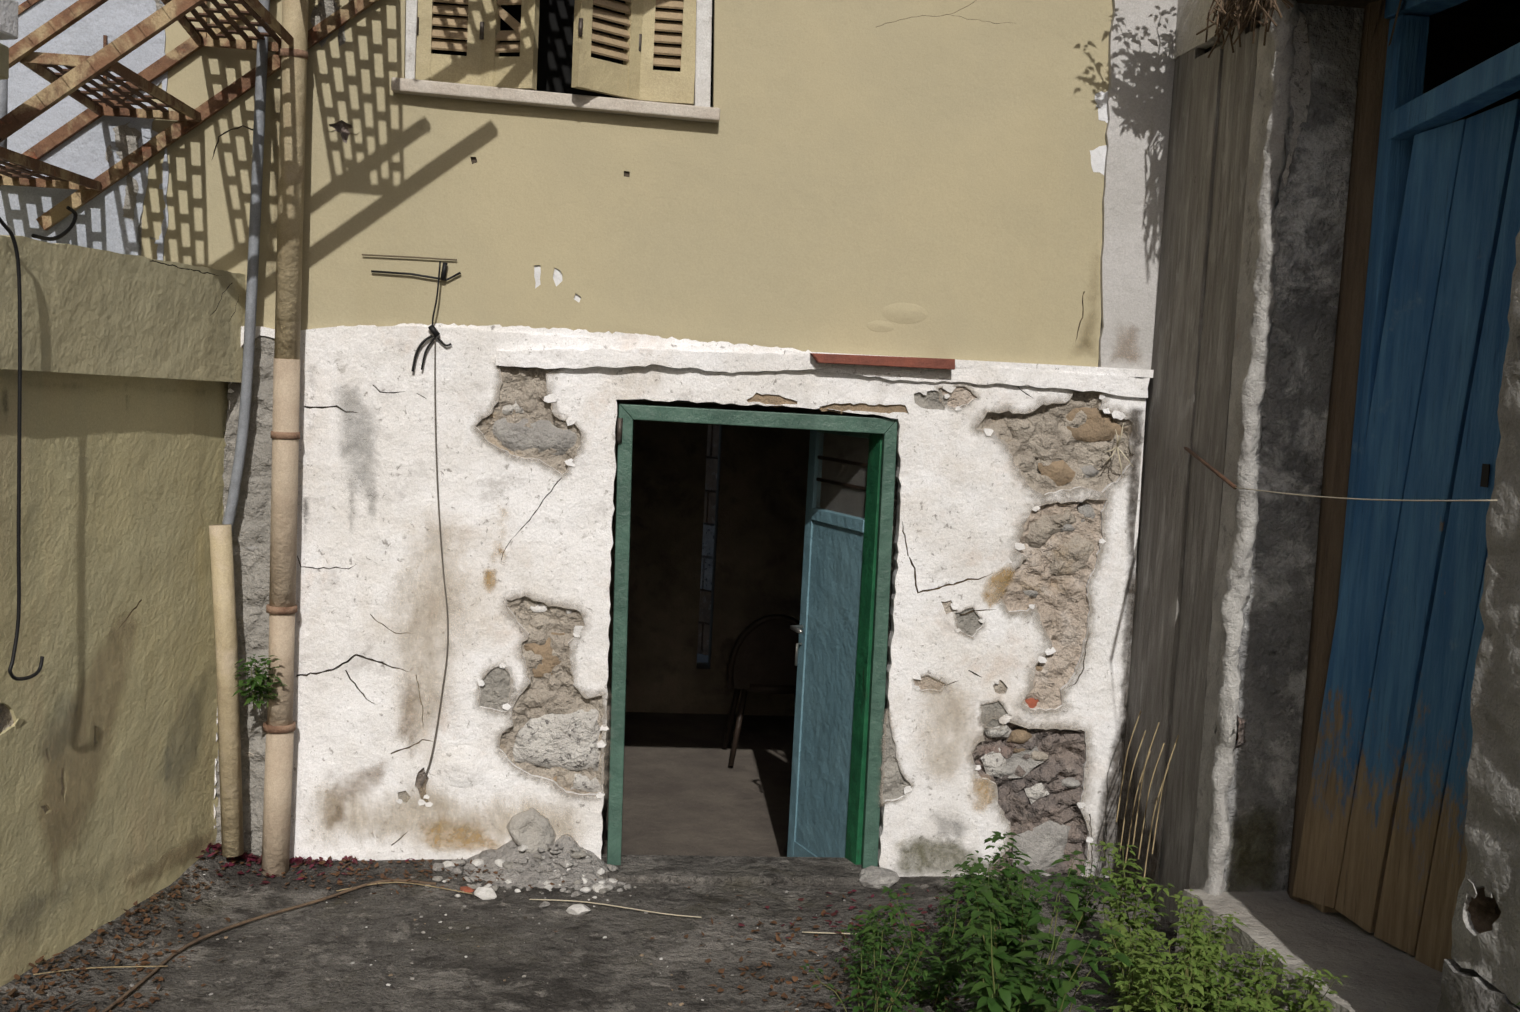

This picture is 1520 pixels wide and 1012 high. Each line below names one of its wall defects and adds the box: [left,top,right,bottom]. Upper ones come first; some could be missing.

spalling [474,365,584,476]
spalling [747,393,797,407]
crack [902,522,996,615]
crack [296,614,434,754]
spalling [475,594,609,798]
spalling [819,384,1136,877]
spalling [1465,879,1501,934]